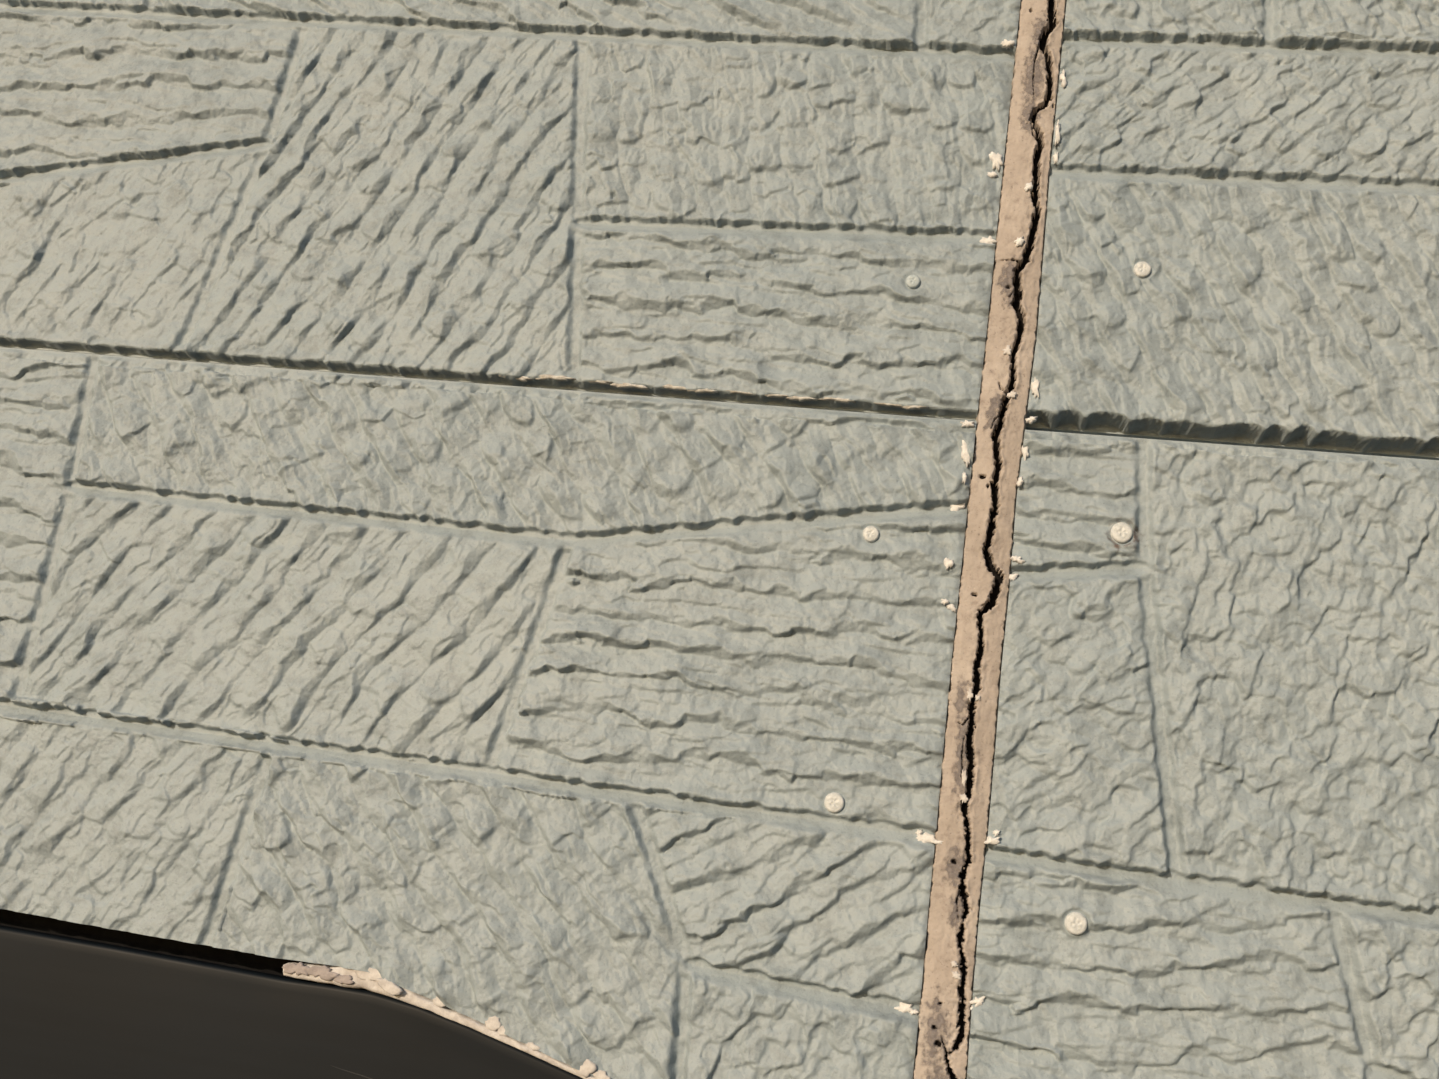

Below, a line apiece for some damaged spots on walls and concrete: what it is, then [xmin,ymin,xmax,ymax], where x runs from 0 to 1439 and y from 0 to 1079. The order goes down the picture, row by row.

crack [933,0,1056,1079]